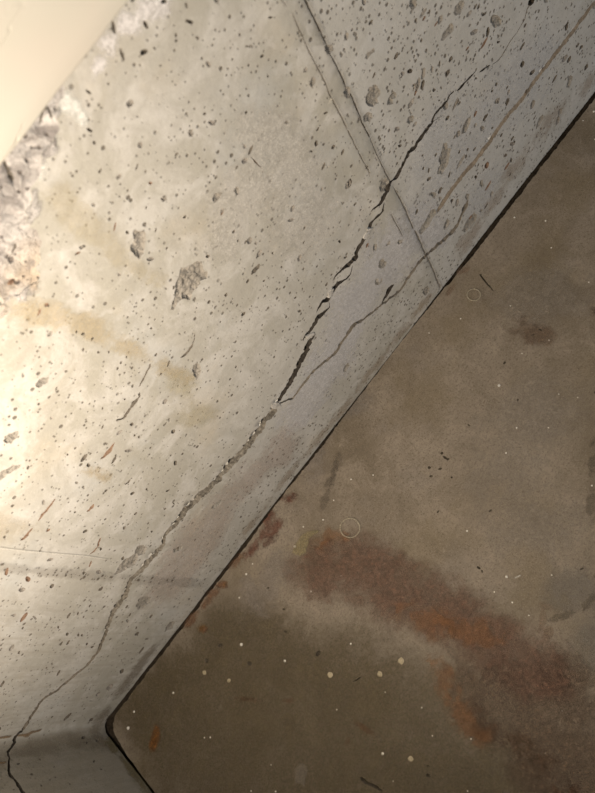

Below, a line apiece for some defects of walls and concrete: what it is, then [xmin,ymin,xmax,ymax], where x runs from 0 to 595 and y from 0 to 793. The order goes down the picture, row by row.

crack [493,0,535,64]
spalling [0,85,65,318]
spalling [171,261,208,310]
crack [6,65,490,793]